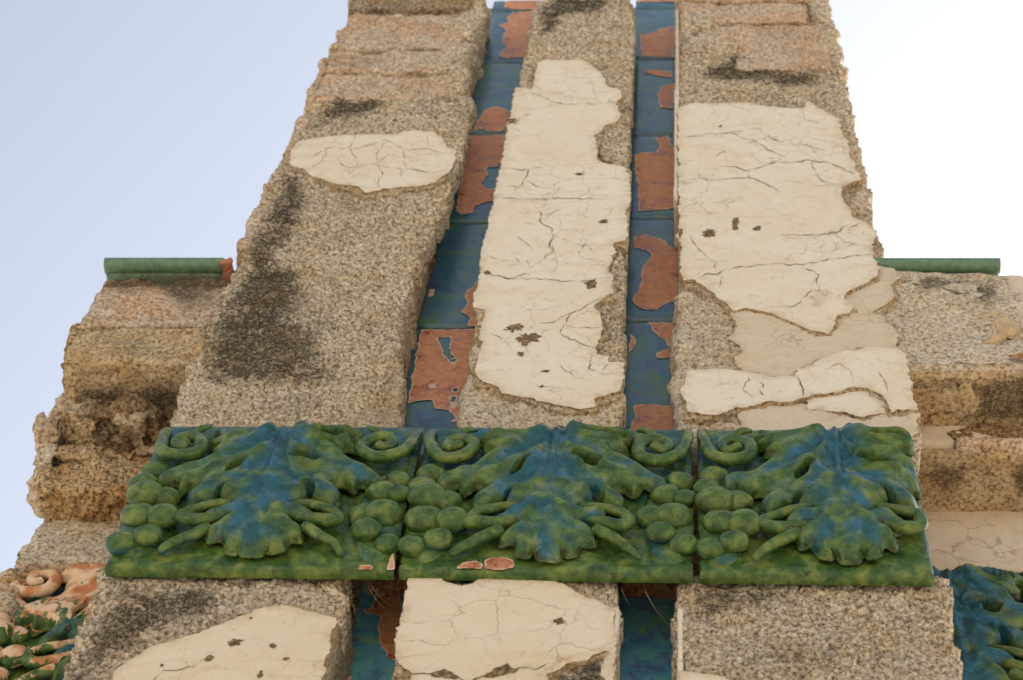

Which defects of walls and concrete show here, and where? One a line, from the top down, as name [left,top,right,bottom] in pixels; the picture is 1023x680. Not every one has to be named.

crack [292,134,443,184]
spalling [499,0,884,258]
crack [688,127,853,192]
damp [112,273,223,304]
damp [204,175,332,382]
spalling [170,58,477,427]
crack [485,167,618,387]
spalling [596,250,636,372]
crack [692,225,869,308]
crack [399,672,485,680]
spalling [552,582,623,680]